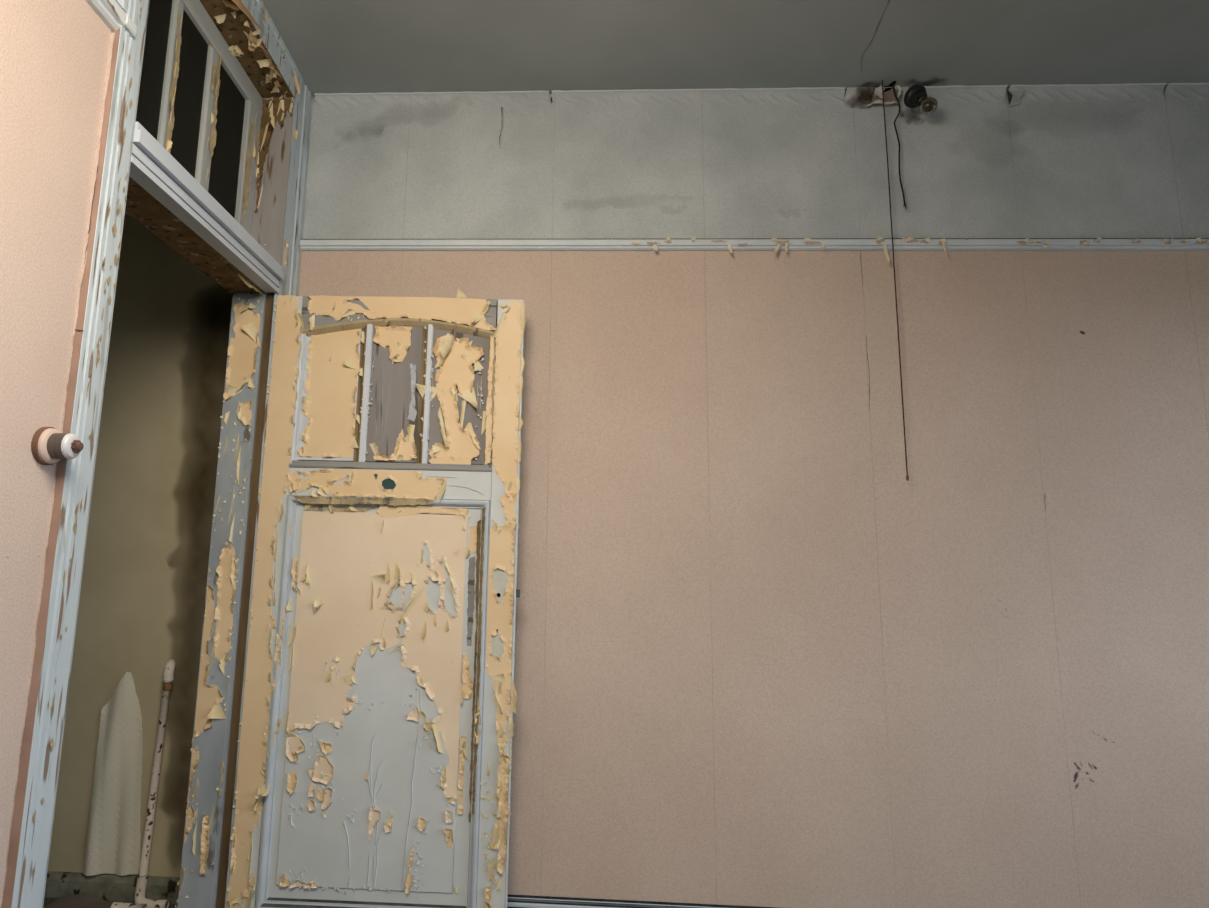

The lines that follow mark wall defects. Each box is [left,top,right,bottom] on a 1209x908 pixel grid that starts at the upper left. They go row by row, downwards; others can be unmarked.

peeling [165,33,182,153]
peeling [210,66,221,164]
peeling [215,0,300,224]
spalling [87,172,128,393]
peeling [175,268,526,908]